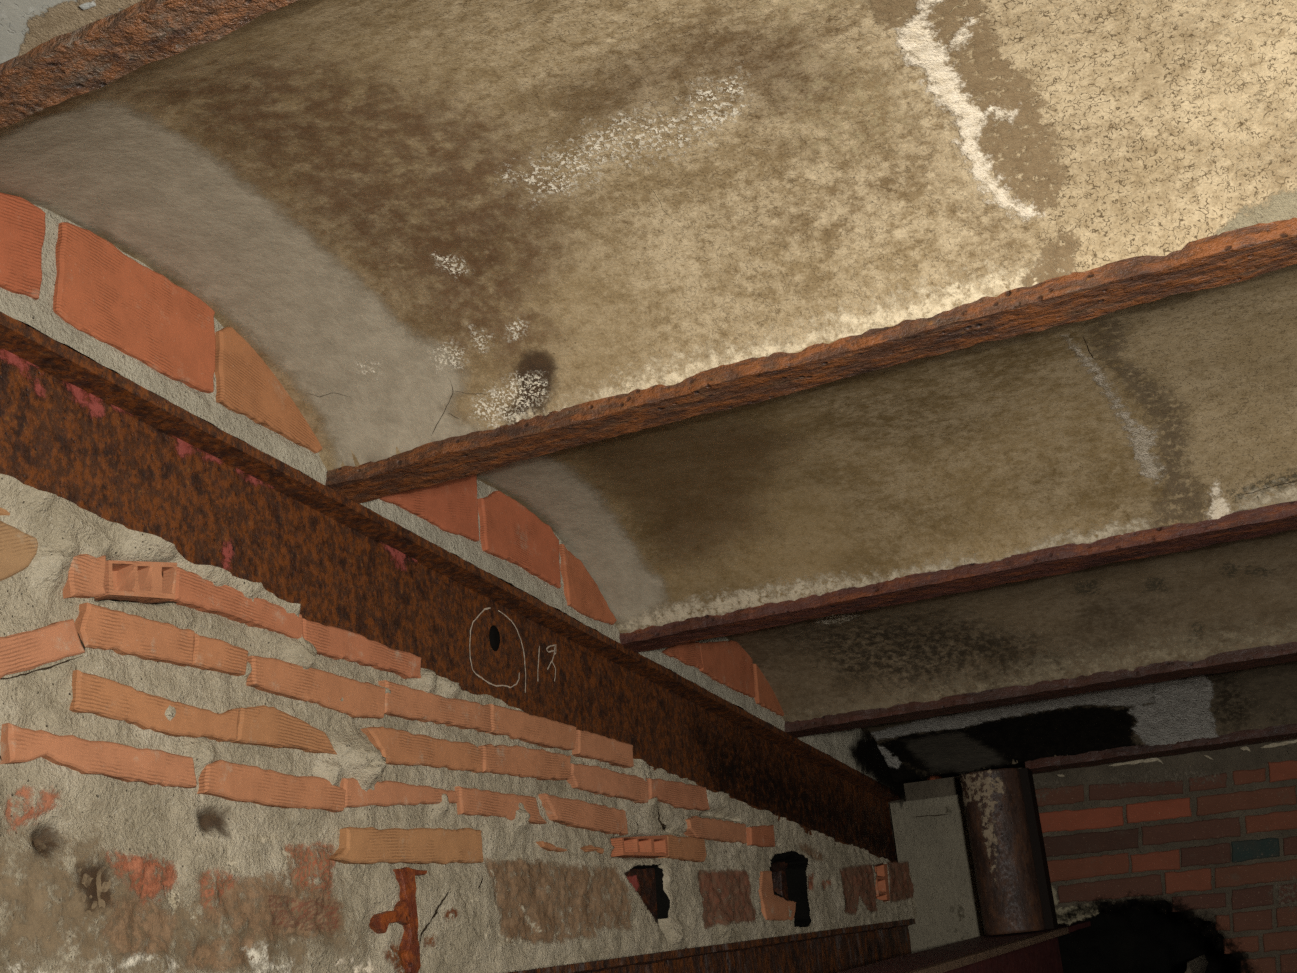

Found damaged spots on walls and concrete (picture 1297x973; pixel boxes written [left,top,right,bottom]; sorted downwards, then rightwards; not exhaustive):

peeling [17,0,143,56]
water stain [882,0,1045,222]
water stain [564,258,1070,408]
water stain [469,353,556,427]
water stain [1061,335,1166,484]
water stain [1207,483,1297,520]
water stain [1000,519,1150,561]
water stain [617,558,982,633]
water stain [877,745,902,769]
spalling [32,827,59,857]
spalling [198,811,227,835]
spalling [78,865,113,911]